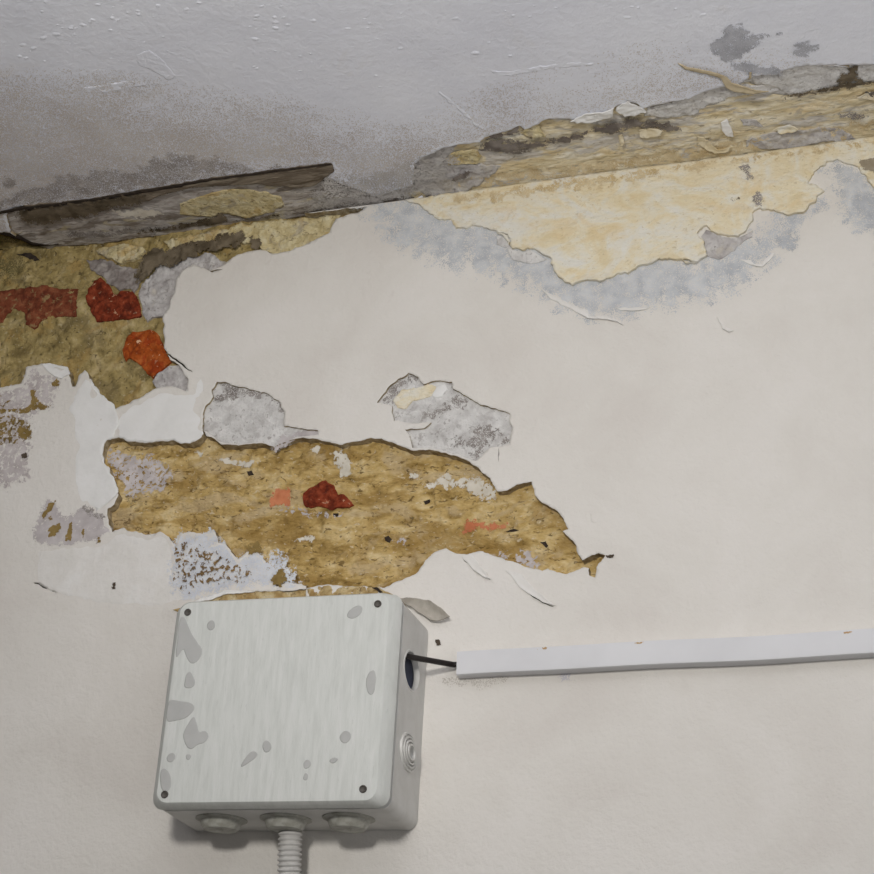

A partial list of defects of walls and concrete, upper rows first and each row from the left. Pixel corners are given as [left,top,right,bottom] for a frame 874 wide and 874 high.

damp [0,23,819,239]
peeling [570,101,647,124]
peeling [678,63,769,95]
spalling [0,119,874,621]